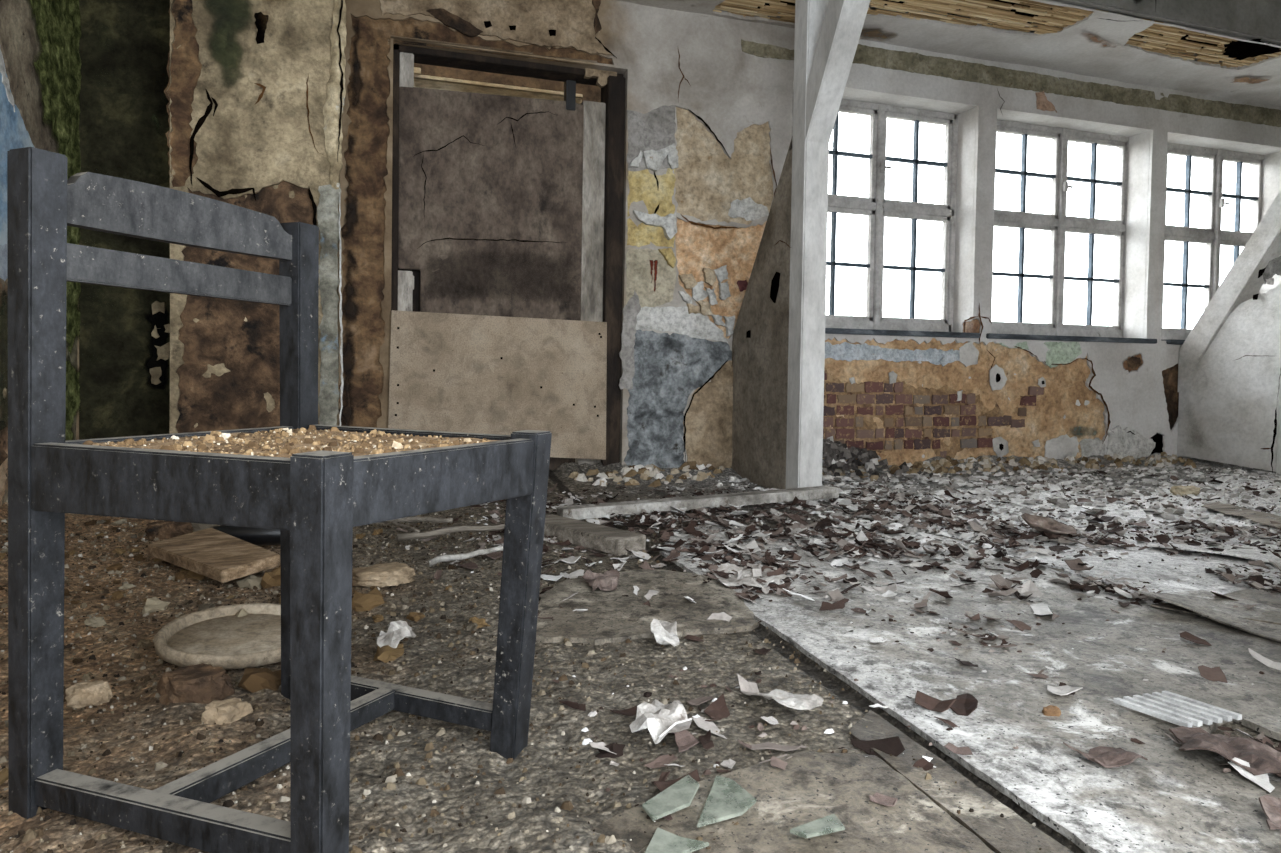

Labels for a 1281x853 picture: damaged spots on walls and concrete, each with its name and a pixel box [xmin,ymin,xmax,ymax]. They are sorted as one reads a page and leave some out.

flaking render [713,0,795,23]
flaking render [867,0,1109,34]
flaking render [1126,18,1281,68]
peeling [0,49,35,309]
crack [189,90,256,201]
crack [308,188,317,226]
crack [414,111,568,249]
flaking render [619,105,777,390]
flaking render [770,272,780,303]
flaking render [1253,256,1281,300]
flaking render [0,388,8,507]
flaking render [823,338,1179,466]